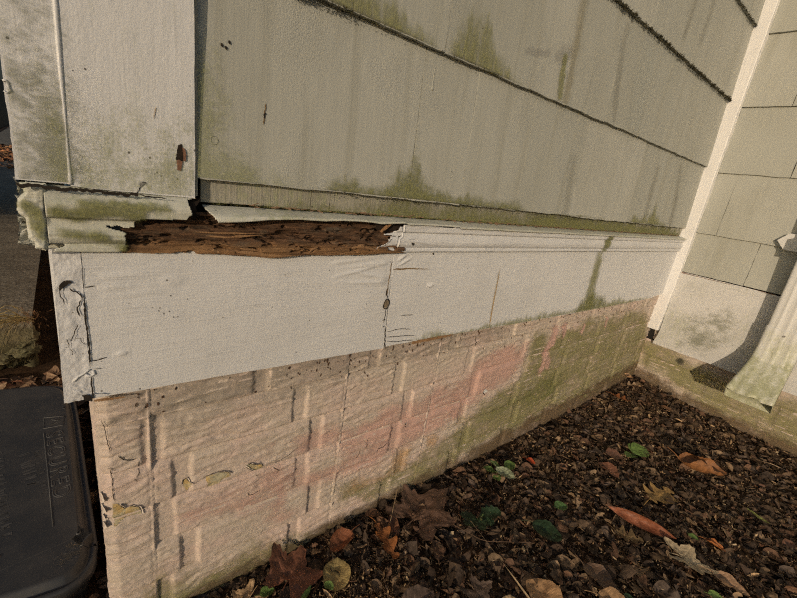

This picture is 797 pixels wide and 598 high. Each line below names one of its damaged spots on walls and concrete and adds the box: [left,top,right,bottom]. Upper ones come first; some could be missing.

spalling [375,224,405,249]
crack [59,267,107,398]
crack [382,263,422,346]
crack [102,423,139,501]